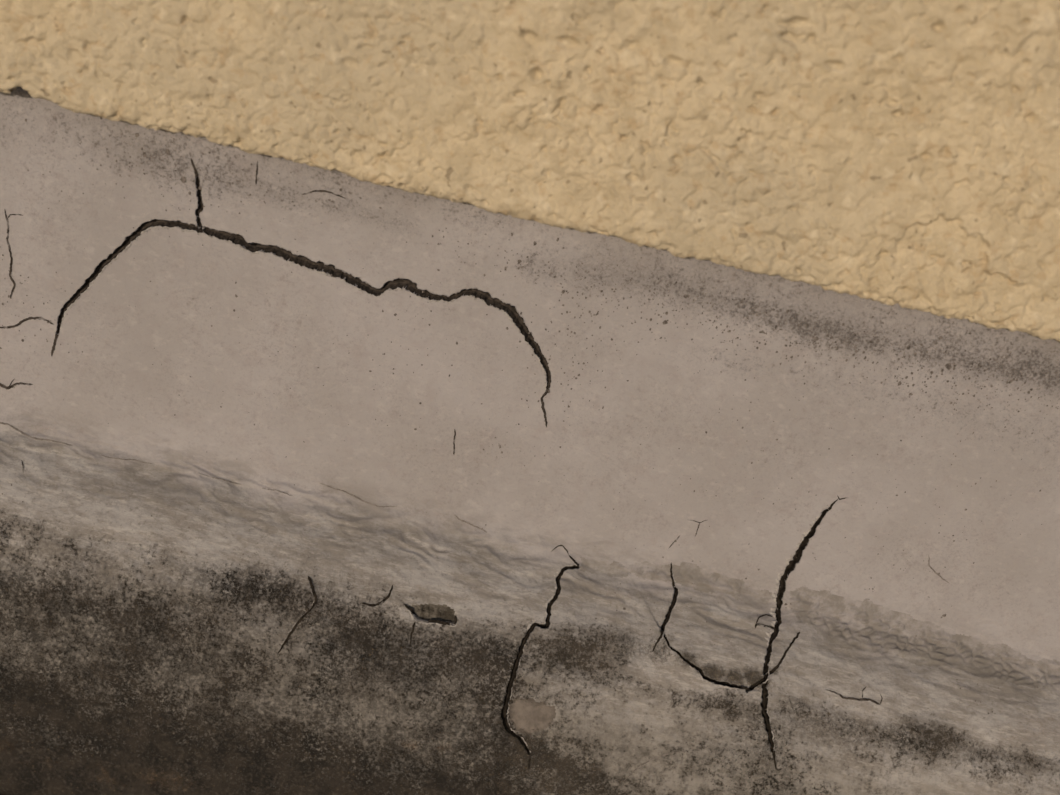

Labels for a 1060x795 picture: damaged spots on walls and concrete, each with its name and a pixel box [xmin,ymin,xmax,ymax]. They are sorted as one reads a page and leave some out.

crack [0,159,551,427]
damp [455,223,1060,426]
crack [0,422,73,468]
crack [199,473,292,496]
crack [278,576,317,653]
spalling [409,603,455,623]
damp [0,512,1060,795]
crack [501,545,579,770]
crack [652,495,845,770]
crack [827,687,883,705]